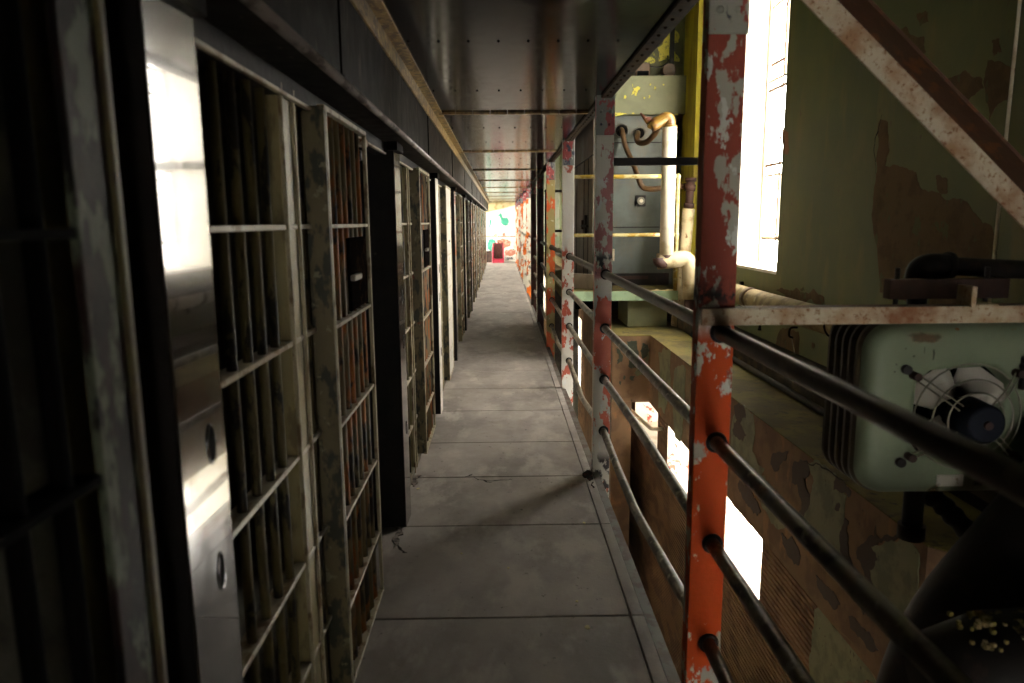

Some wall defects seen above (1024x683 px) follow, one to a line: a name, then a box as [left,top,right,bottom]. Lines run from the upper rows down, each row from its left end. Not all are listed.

peeling [983,38,1016,120]
peeling [872,119,997,293]
peeling [804,460,847,552]
peeling [870,540,920,614]
peeling [809,607,876,683]